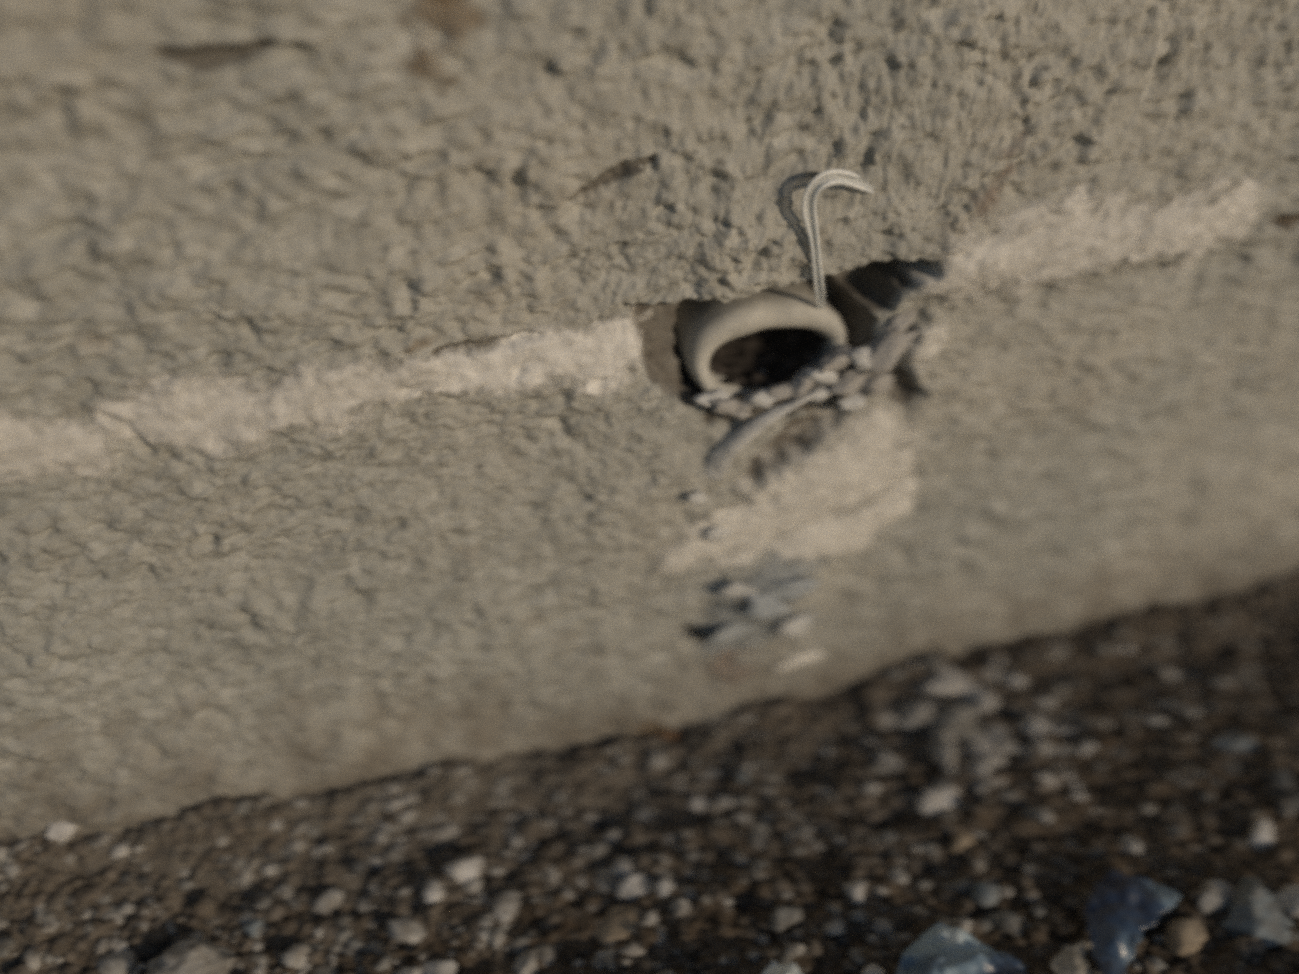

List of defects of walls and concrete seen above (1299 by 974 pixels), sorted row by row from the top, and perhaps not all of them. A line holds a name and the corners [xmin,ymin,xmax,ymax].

crack [569,156,653,199]
crack [432,338,500,354]
spalling [624,258,934,505]
peeling [701,551,830,655]